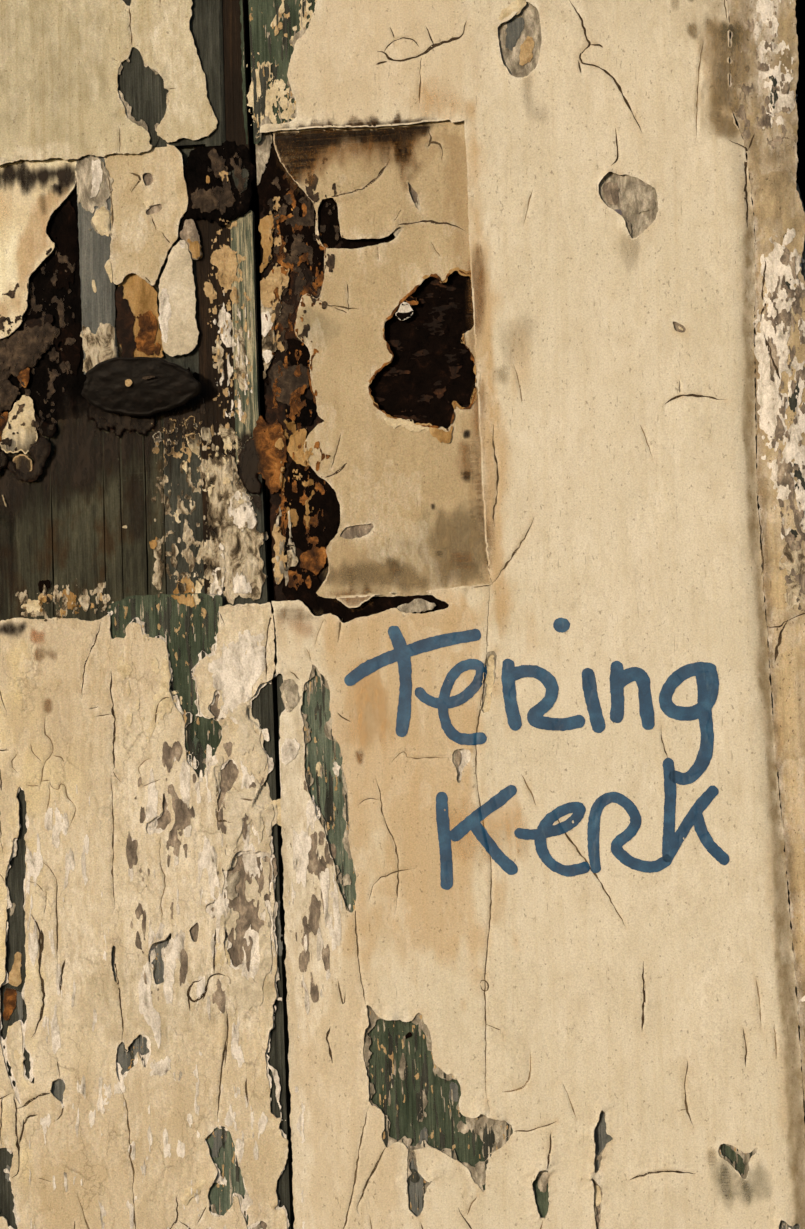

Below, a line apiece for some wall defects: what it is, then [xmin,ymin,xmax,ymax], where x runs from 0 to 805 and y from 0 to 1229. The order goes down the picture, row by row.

peeling [118,48,169,148]
crack [571,3,642,165]
corrosion [115,273,164,358]
corrosion [236,137,344,612]
peeling [749,228,805,612]
crack [81,622,160,911]
peeling [15,196,453,1229]
crack [0,822,65,1038]
peeling [0,787,89,1104]
crack [0,1062,64,1182]
crack [343,1112,385,1229]
peeling [363,1005,513,1216]